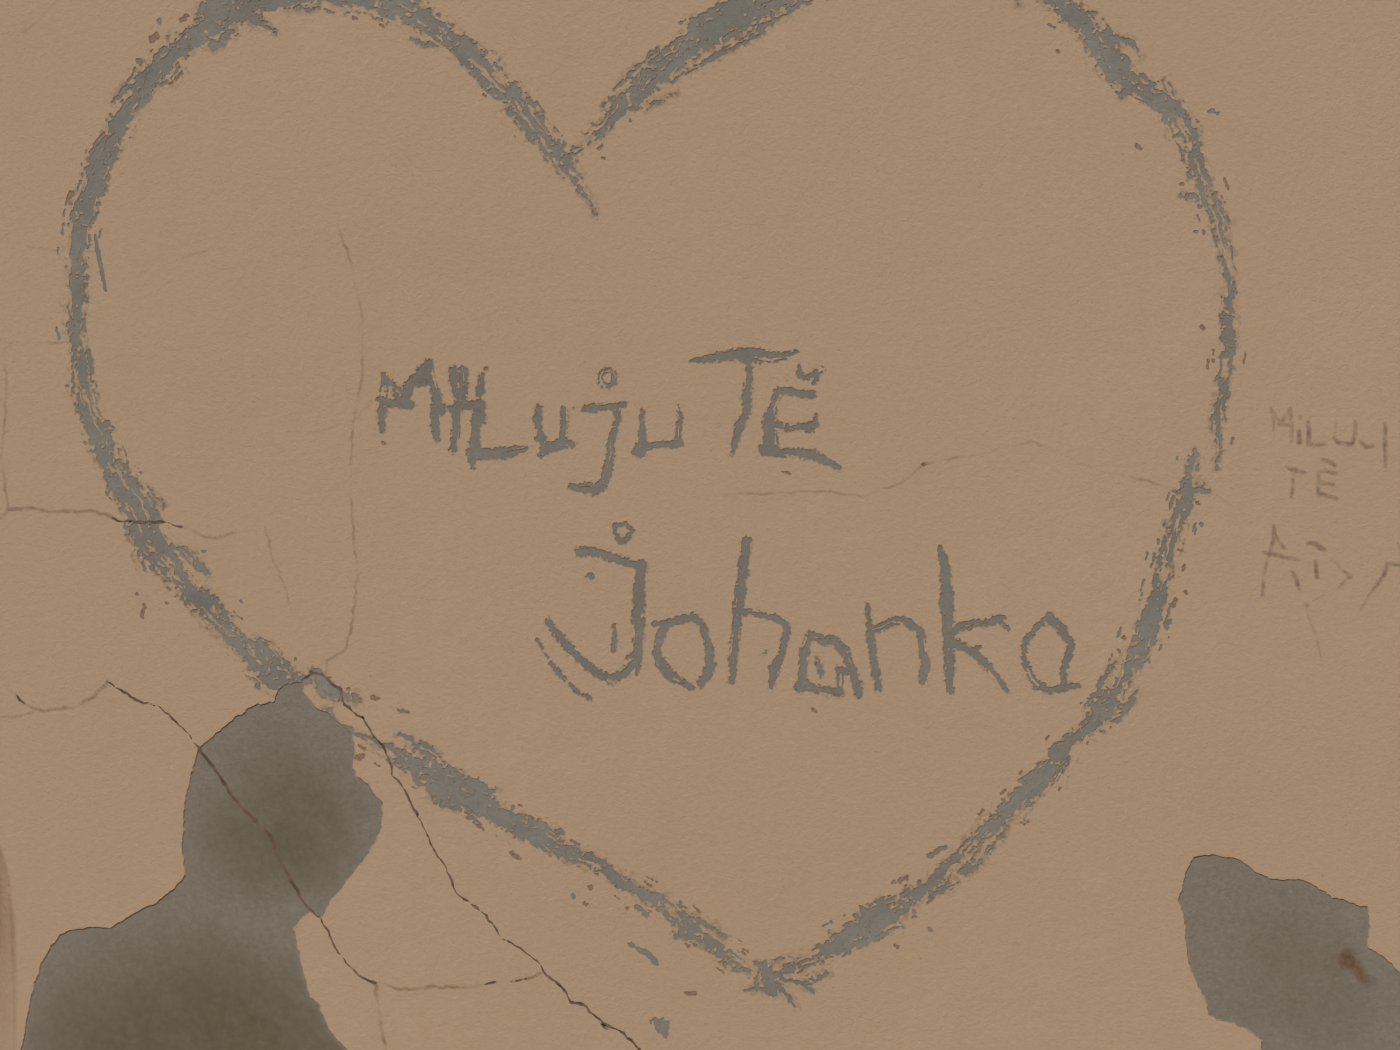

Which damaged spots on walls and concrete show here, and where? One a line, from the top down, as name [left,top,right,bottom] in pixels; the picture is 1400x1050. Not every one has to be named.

crack [112,517,183,528]
peeling [21,681,383,1050]
crack [108,682,377,984]
crack [301,671,641,1050]
peeling [1178,855,1400,1050]